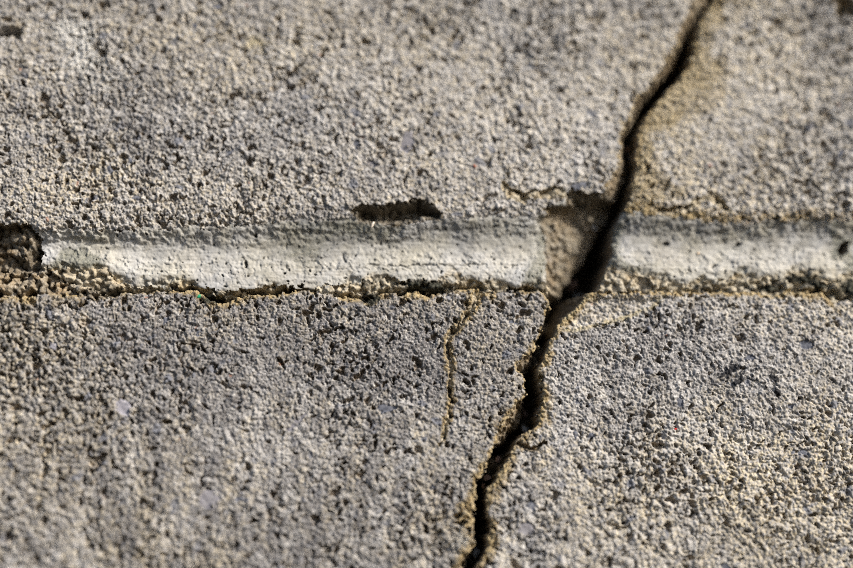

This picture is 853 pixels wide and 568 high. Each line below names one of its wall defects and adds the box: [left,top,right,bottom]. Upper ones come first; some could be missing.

spalling [0,221,113,302]
crack [43,265,551,447]
spalling [350,197,444,228]
crack [456,0,853,568]